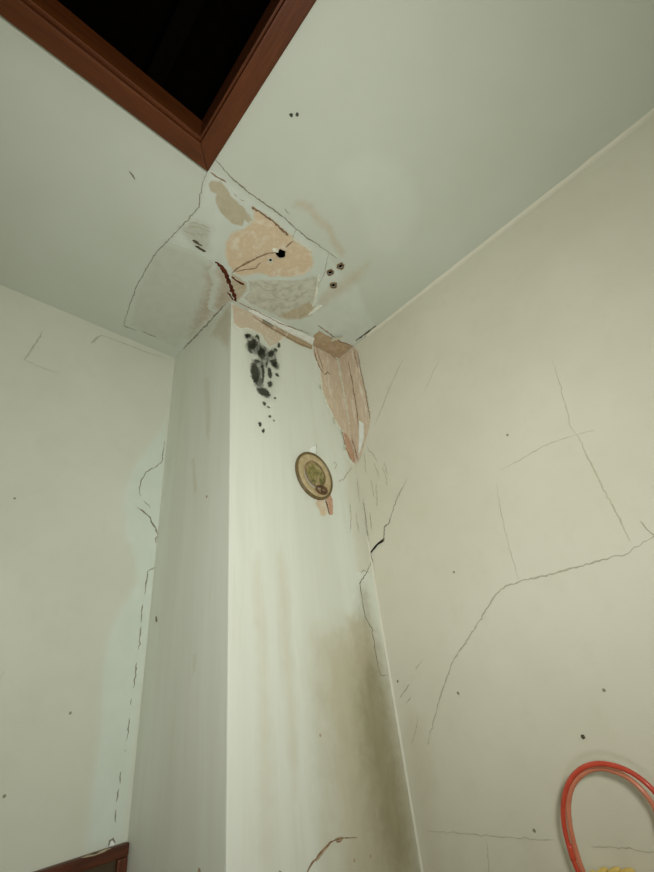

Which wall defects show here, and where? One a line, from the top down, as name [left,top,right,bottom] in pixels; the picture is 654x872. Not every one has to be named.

crack [91,163,376,359]
damp [208,303,287,434]
peeling [205,172,370,465]
corrosion [327,262,344,290]
crack [137,441,165,542]
peeling [314,495,333,517]
crack [333,447,408,676]
crack [427,361,654,745]
crack [126,568,153,741]
damp [247,452,456,872]
crack [307,836,357,872]